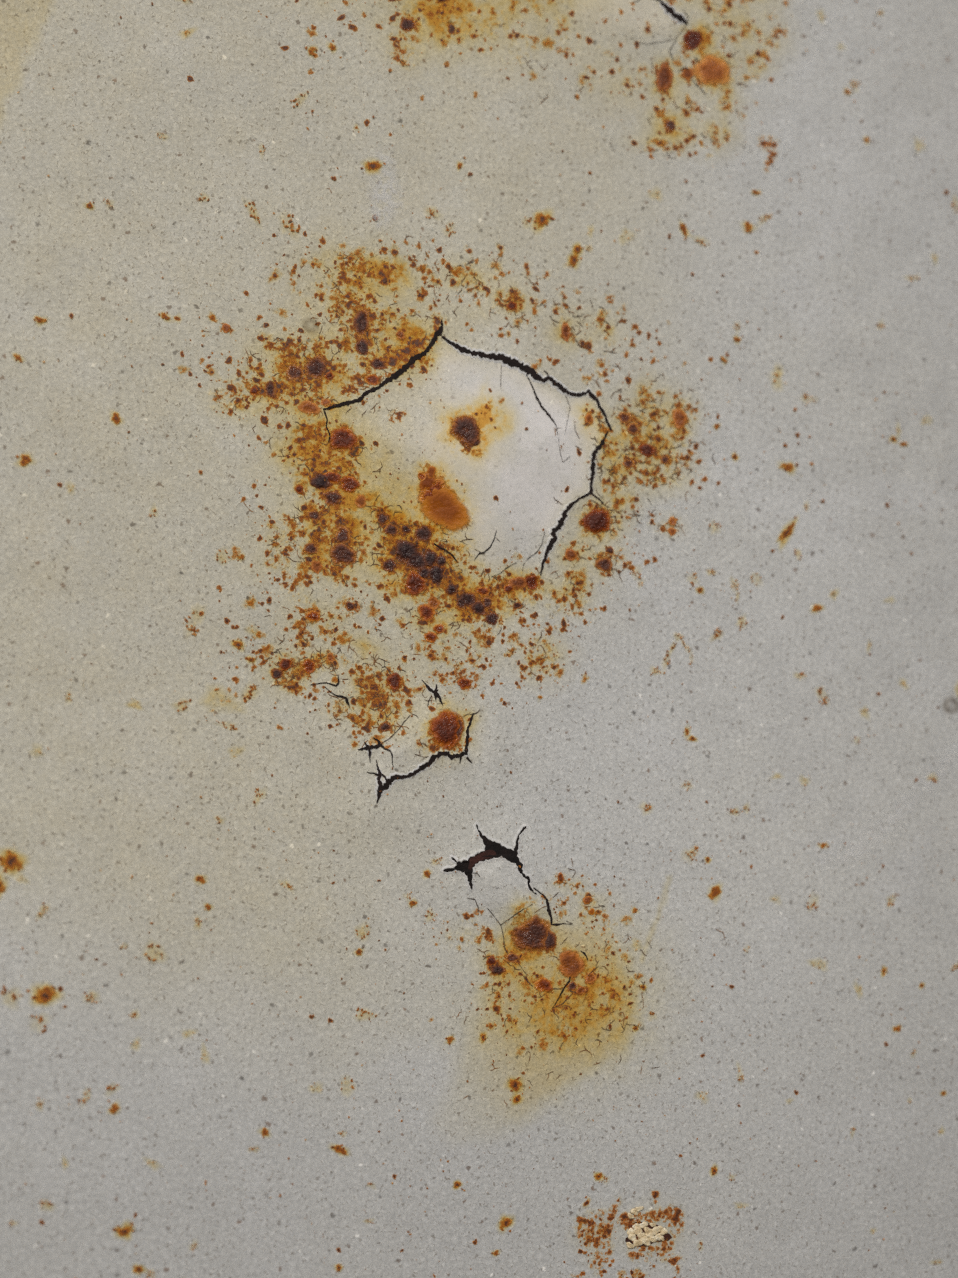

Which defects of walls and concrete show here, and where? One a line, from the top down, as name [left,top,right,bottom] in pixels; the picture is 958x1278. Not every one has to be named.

rust [280,0,787,177]
crack [632,0,706,94]
rust [106,202,778,812]
crack [323,320,612,577]
crack [358,680,480,803]
crack [440,821,597,1009]
rust [399,858,673,1104]
peeling [576,1191,684,1278]